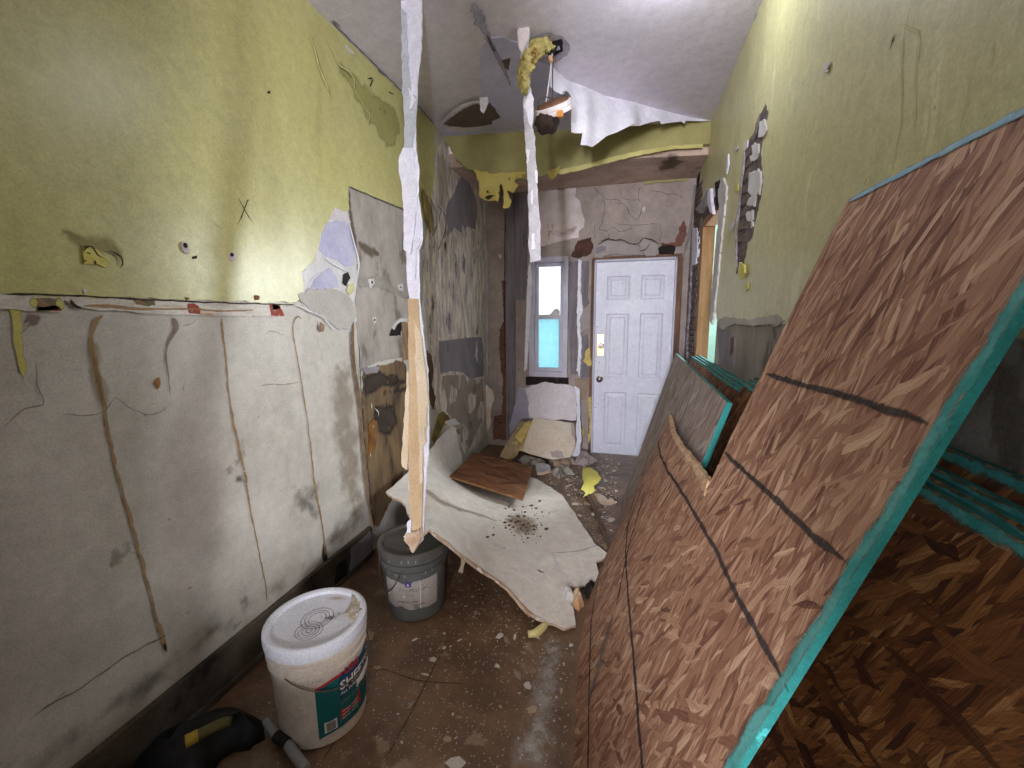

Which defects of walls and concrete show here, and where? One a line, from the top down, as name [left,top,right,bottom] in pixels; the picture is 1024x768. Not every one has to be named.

peeling [440,27,566,137]
peeling [557,111,571,130]
crack [594,186,677,251]
flaking render [729,103,769,292]
flaking render [298,148,585,441]
flaking render [717,314,785,366]
damp [292,316,338,562]